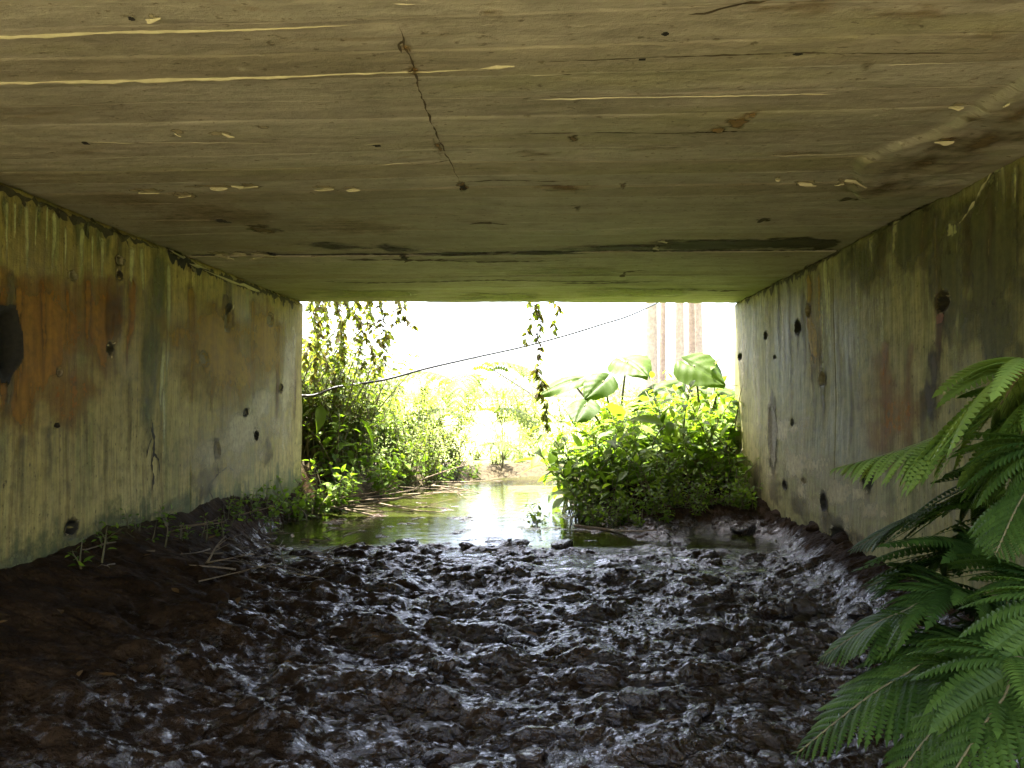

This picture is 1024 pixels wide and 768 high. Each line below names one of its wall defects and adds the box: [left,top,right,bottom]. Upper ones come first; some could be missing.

crack [397,27,557,191]
leakage [960,108,1024,153]
spalling [0,274,24,411]
corrosion [0,269,137,429]
leakage [2,196,147,309]
peeling [130,183,261,198]
leakage [313,242,417,252]
leakage [513,237,855,372]
crack [146,422,160,489]